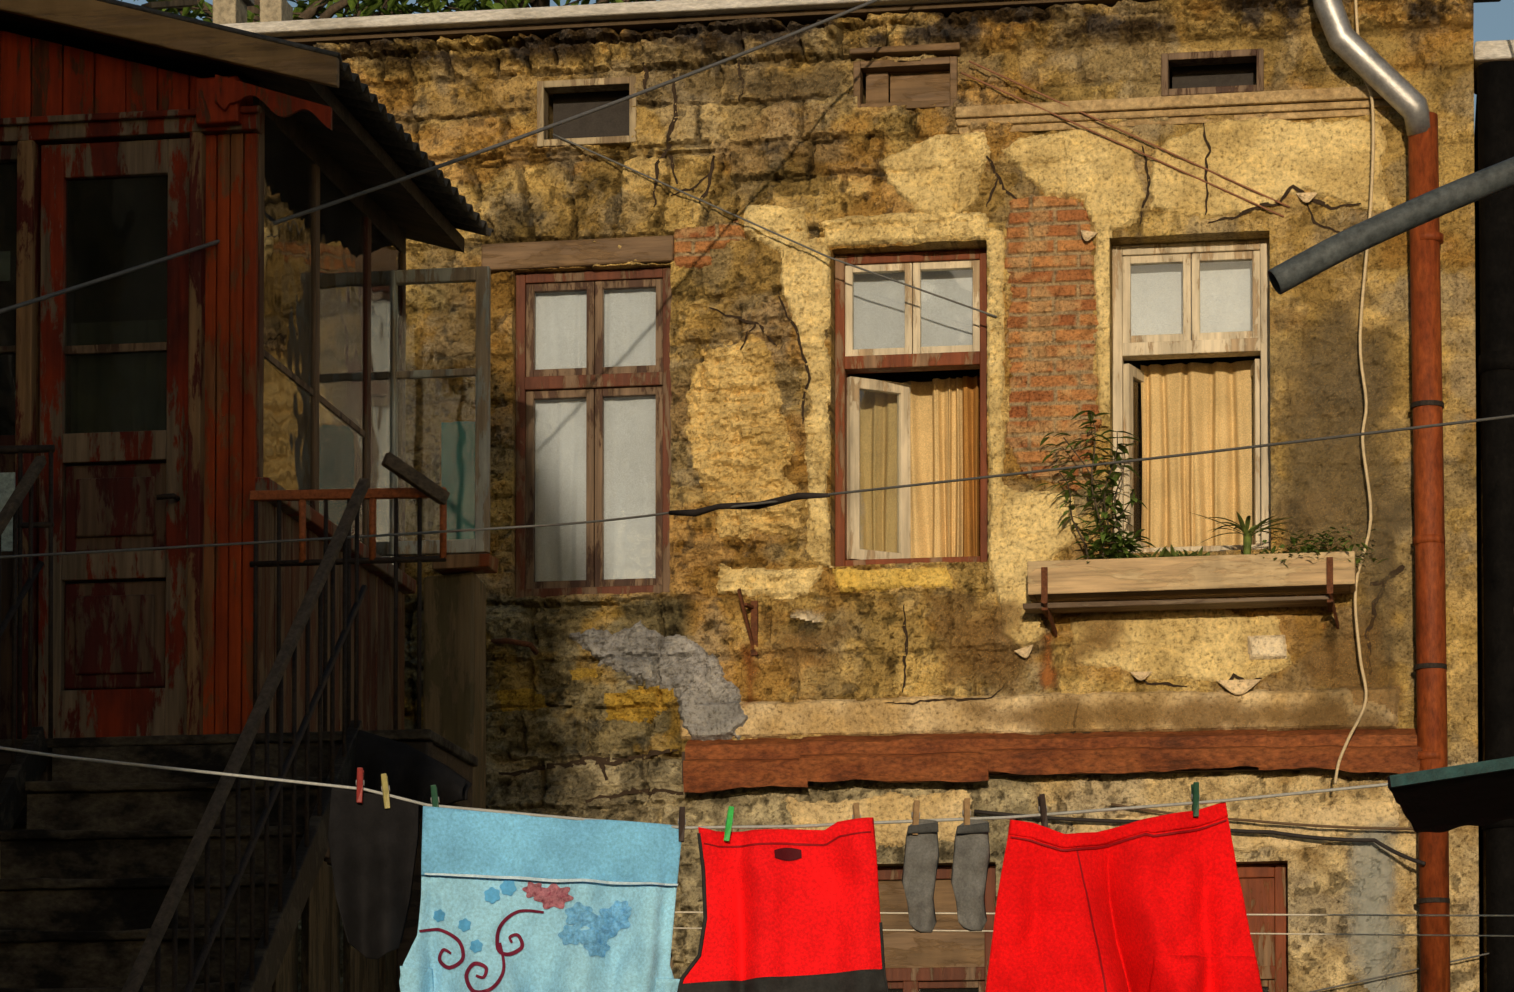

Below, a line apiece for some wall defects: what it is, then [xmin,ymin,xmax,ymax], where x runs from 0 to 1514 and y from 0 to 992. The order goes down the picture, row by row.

crack [986,156,1017,207]
crack [1140,146,1151,224]
crack [1203,123,1361,233]
flaking render [673,117,1392,658]
flaking render [1068,609,1292,695]
spalling [569,668,675,724]